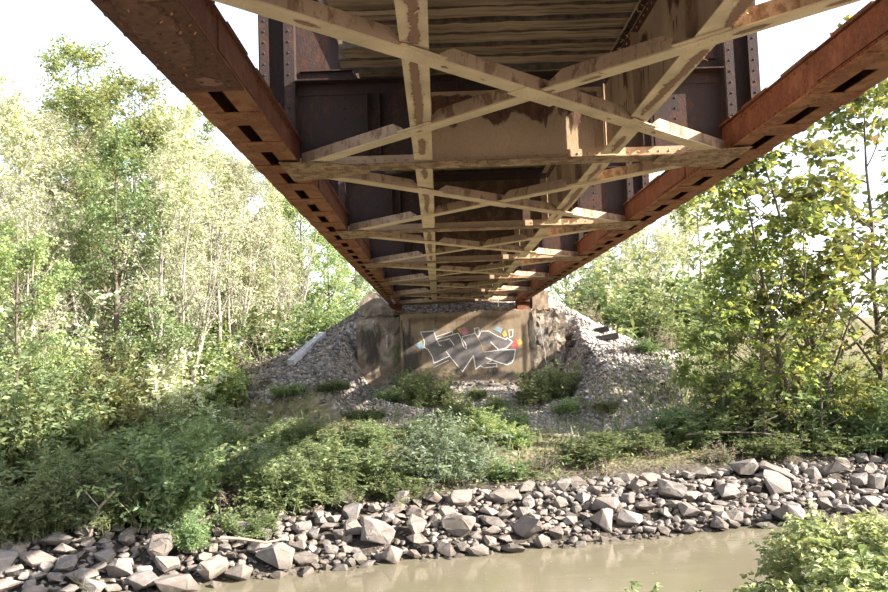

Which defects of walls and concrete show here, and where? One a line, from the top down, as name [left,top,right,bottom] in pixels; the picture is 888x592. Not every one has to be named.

peeling [398,0,422,44]
peeling [725,0,772,35]
peeling [408,62,429,155]